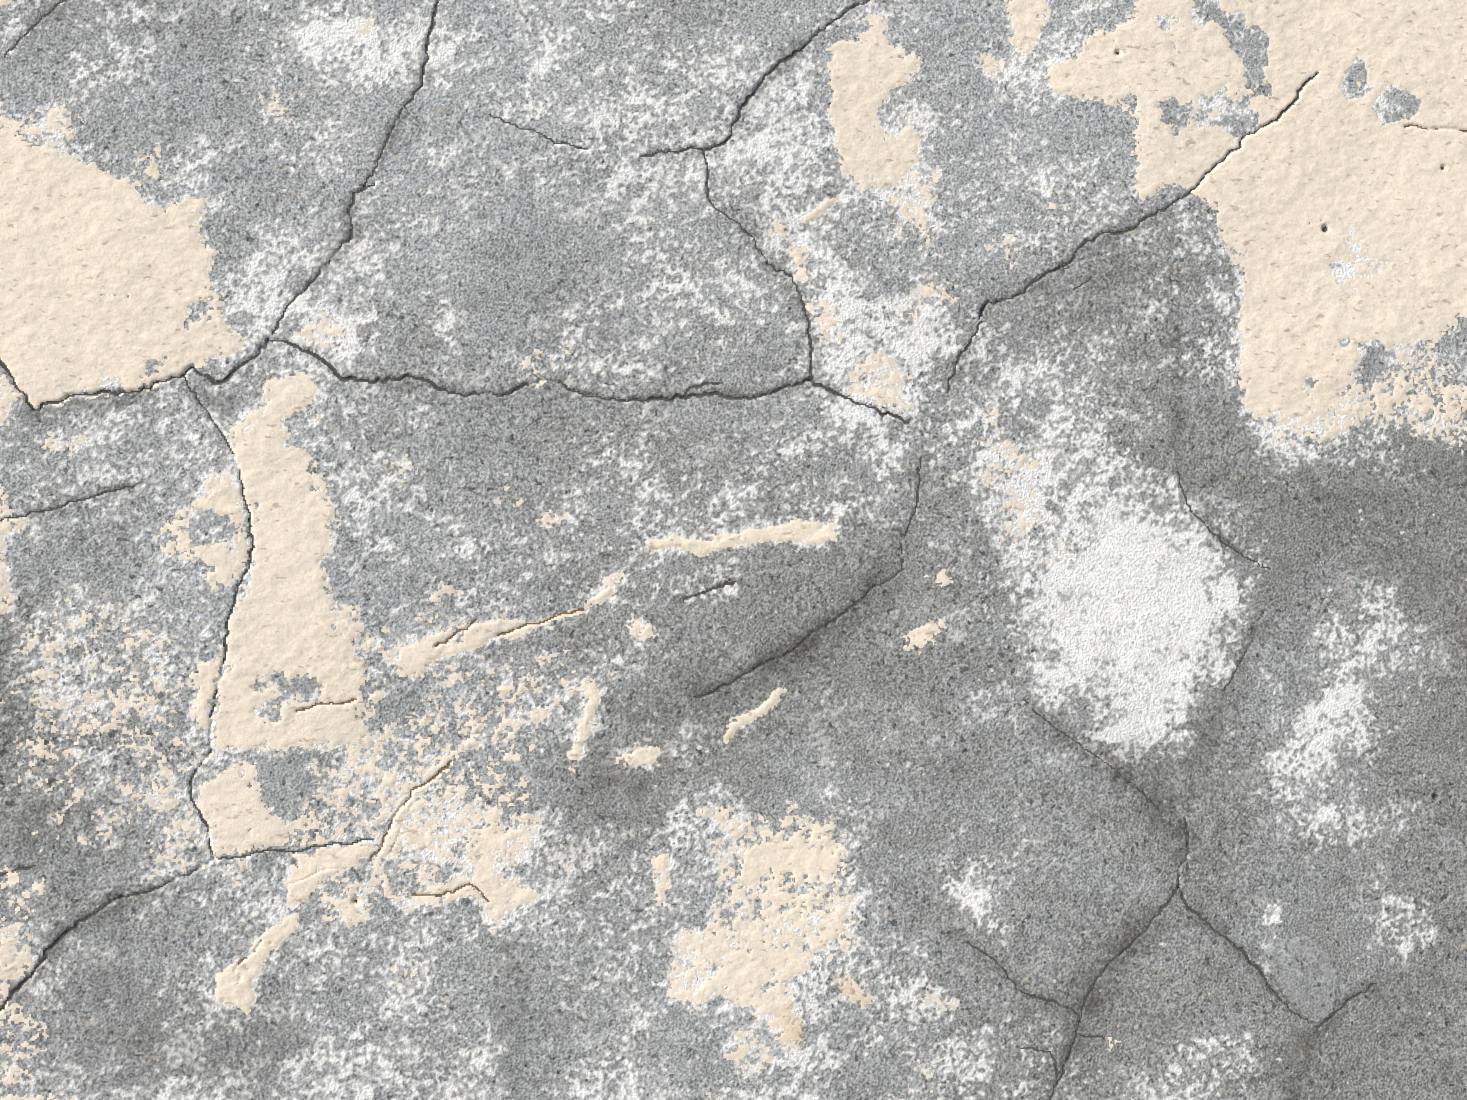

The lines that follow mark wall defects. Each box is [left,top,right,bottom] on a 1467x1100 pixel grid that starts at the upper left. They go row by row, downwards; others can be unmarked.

peeling [0,105,247,426]
peeling [825,13,941,250]
crack [946,72,1319,393]
peeling [1044,0,1467,455]
crack [1404,125,1467,133]
peeling [0,370,626,1015]
crack [0,0,922,1011]
crack [1178,471,1271,570]
crack [1223,649,1247,691]
peeling [0,865,75,1100]
peeling [666,799,861,1076]
crack [967,699,1376,1100]